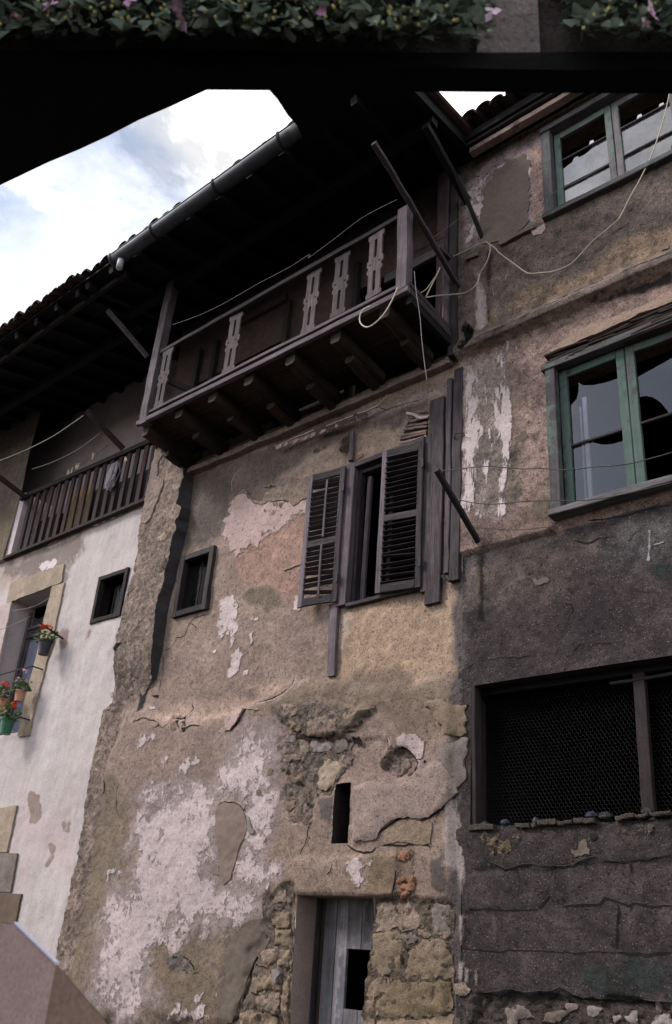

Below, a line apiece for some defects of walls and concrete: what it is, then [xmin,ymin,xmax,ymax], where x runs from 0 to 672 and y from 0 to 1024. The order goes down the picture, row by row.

peeling [465,163,505,261]
flaking render [531,224,546,236]
peeling [460,337,518,518]
flaking render [222,477,309,557]
flaking render [211,594,259,678]
crack [133,703,200,729]
crack [225,677,297,732]
peeling [85,720,285,1024]
peeling [346,858,373,887]